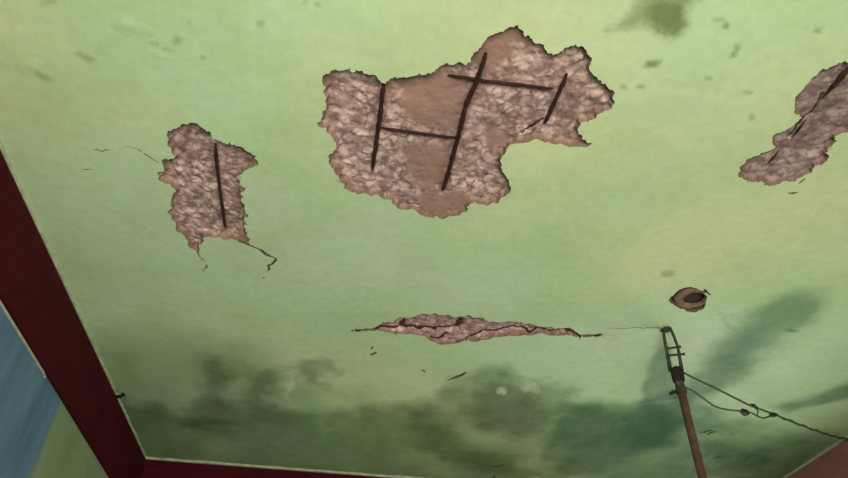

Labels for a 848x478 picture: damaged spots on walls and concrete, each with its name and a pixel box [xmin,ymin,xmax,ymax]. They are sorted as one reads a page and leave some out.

spalling [317,26,615,219]
spalling [738,61,848,186]
spalling [157,123,258,253]
crack [238,240,277,278]
spalling [351,313,603,345]